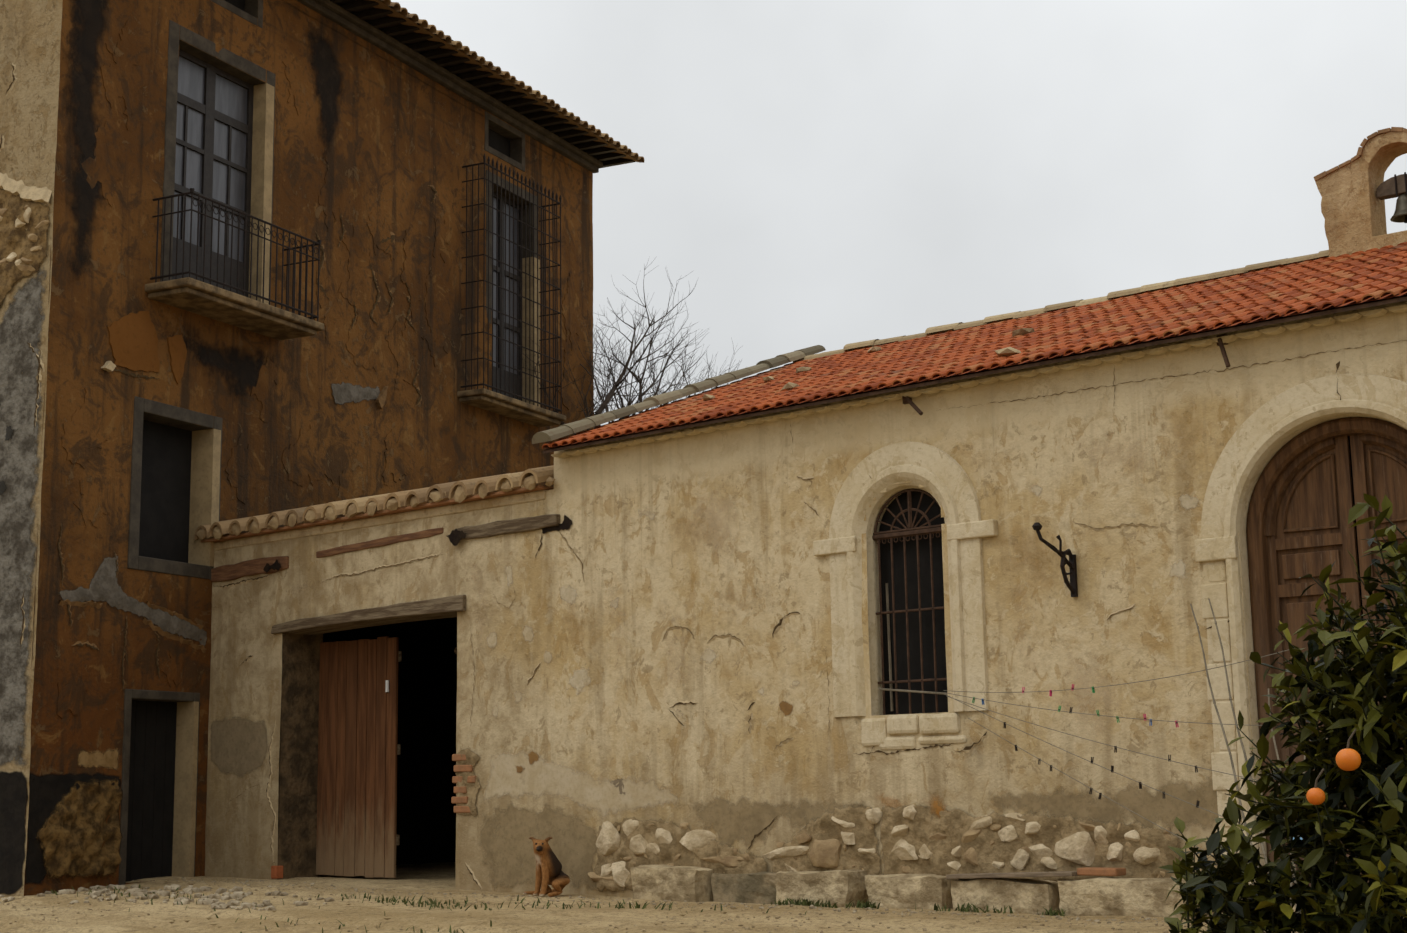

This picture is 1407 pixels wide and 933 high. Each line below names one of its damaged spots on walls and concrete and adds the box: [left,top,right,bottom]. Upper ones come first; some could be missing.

flaking render [59,556,207,653]
flaking render [451,748,480,817]